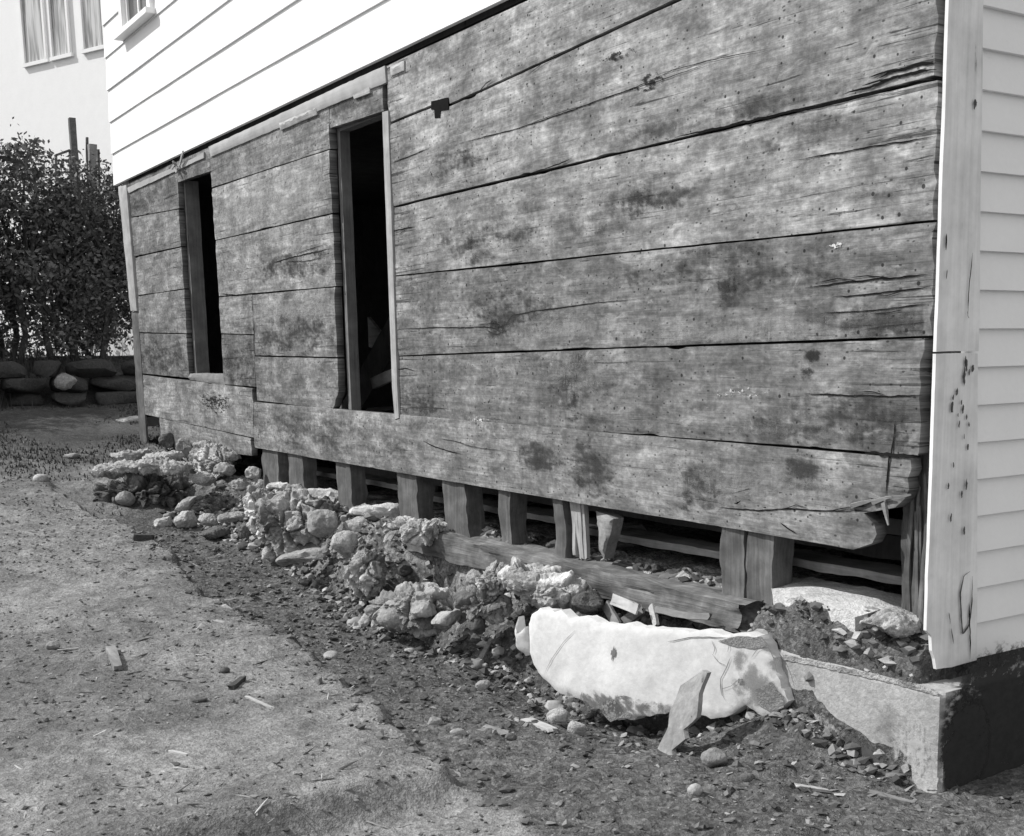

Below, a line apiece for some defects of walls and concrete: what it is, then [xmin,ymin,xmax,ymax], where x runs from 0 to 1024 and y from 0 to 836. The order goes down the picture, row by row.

crack [675,62,937,138]
water stain [717,247,783,306]
crack [808,253,973,330]
water stain [521,443,553,471]
water stain [574,444,613,496]
crack [719,505,868,533]
water stain [941,692,990,791]